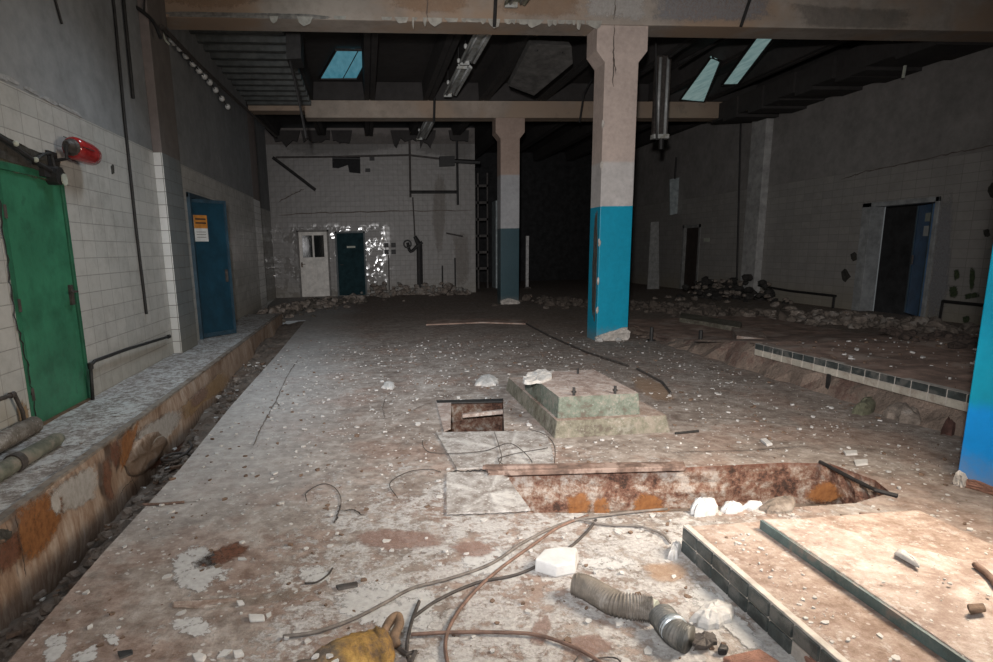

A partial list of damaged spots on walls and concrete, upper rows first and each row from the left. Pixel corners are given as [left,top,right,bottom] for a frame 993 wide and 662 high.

crack [253,360,298,445]
spalling [953,470,993,495]
corrosion [568,493,610,513]
corrosion [633,494,669,513]
corrosion [0,490,64,572]